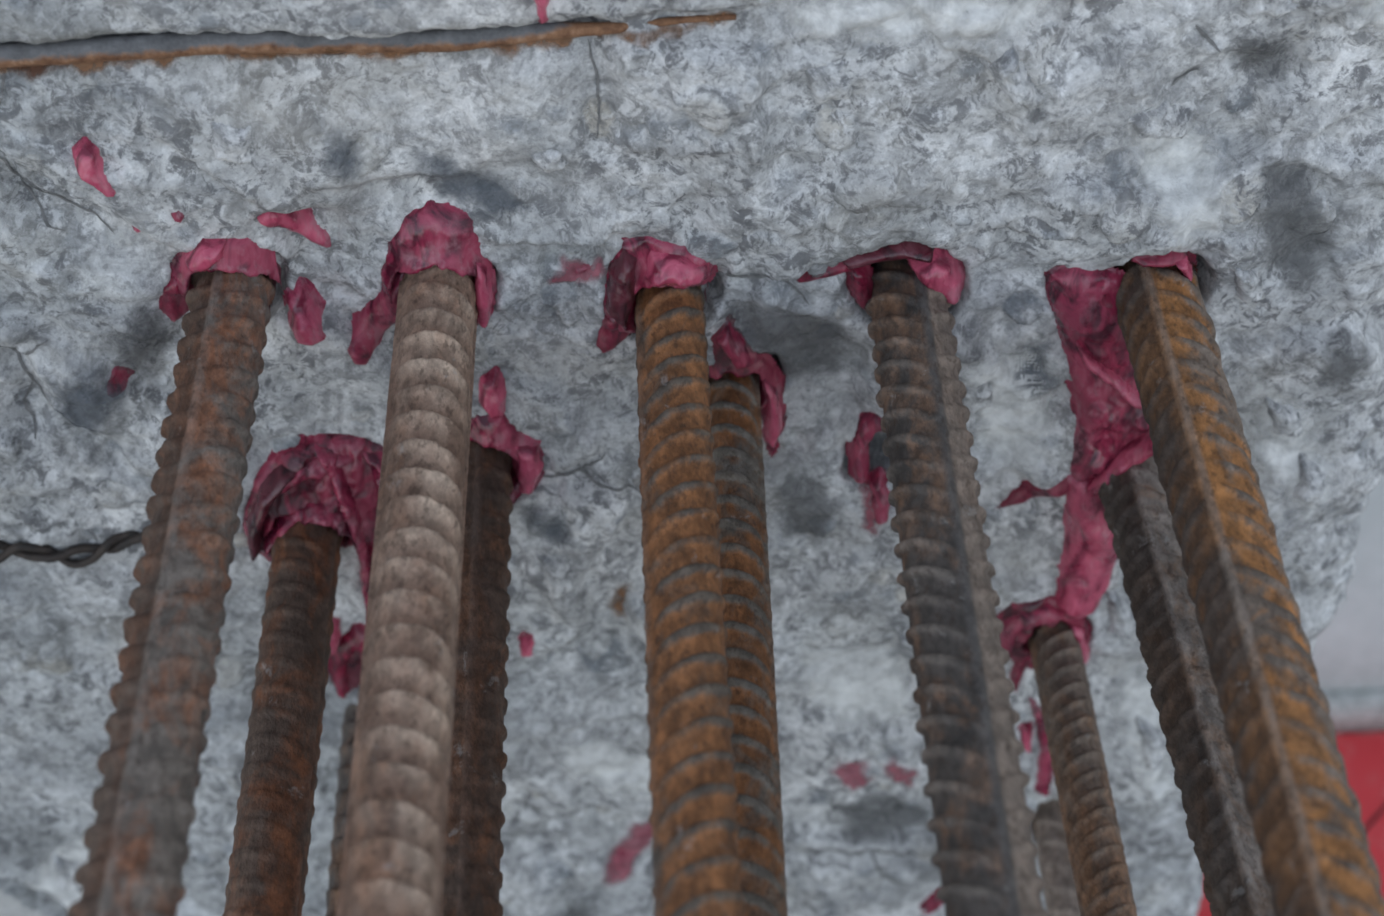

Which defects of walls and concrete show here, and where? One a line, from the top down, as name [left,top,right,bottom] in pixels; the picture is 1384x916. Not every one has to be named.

corrosion [0,57,176,80]
spalling [0,0,540,44]
corrosion [226,49,409,59]
corrosion [491,37,574,54]
corrosion [597,12,732,47]
spalling [209,122,252,165]
crack [0,157,114,233]
crack [0,340,111,441]
spalling [333,546,366,636]
spalling [0,542,145,916]
spalling [1085,558,1204,916]
spalling [302,669,360,916]